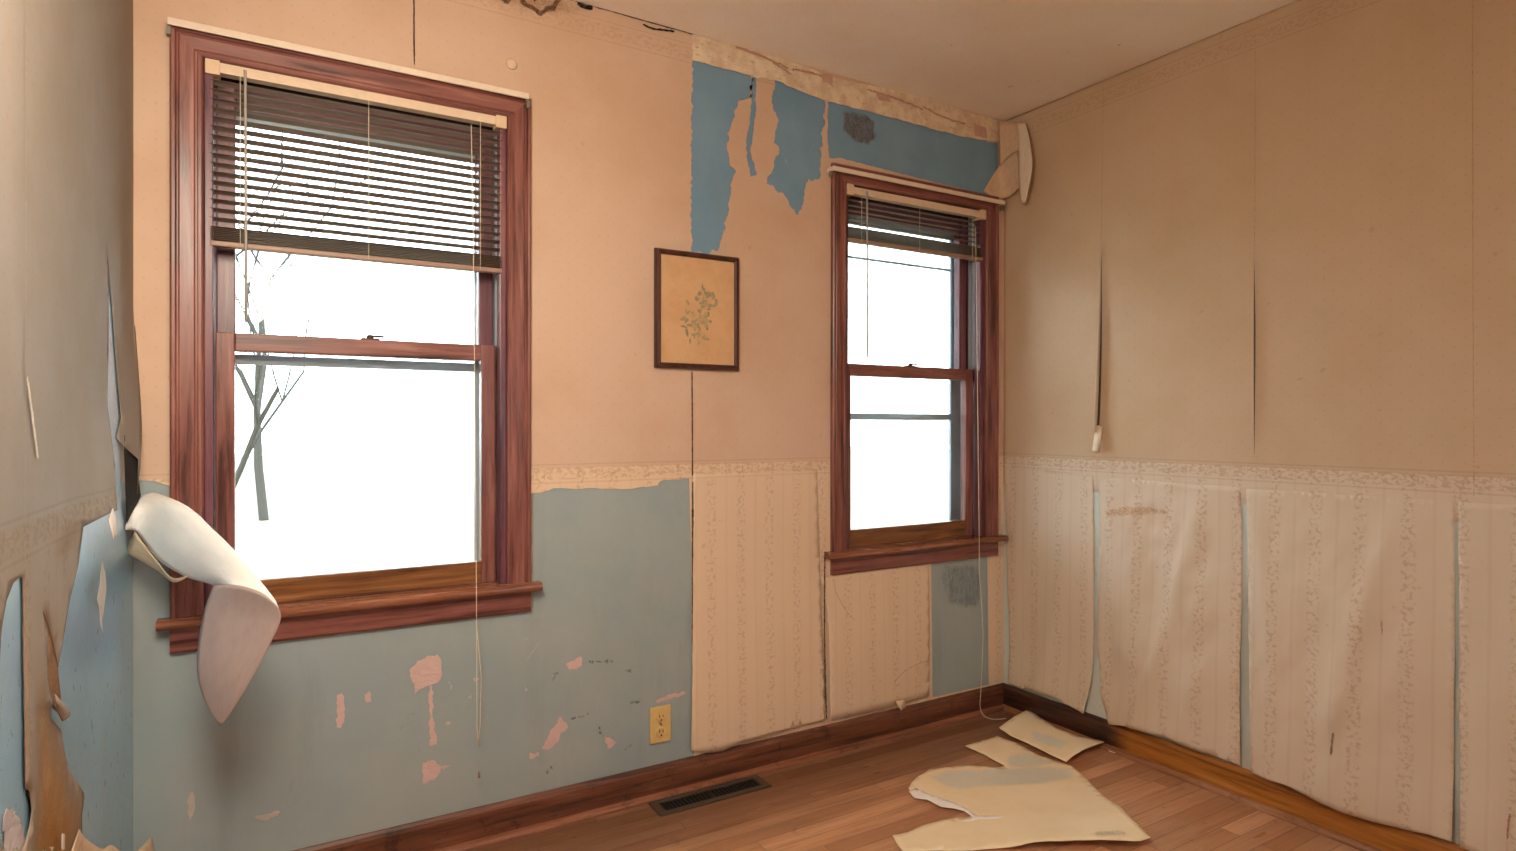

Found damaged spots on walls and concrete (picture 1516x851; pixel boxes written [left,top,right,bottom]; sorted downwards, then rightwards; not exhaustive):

flaking render [692,34,1003,141]
damp [34,663,82,851]
peeling [409,655,452,784]